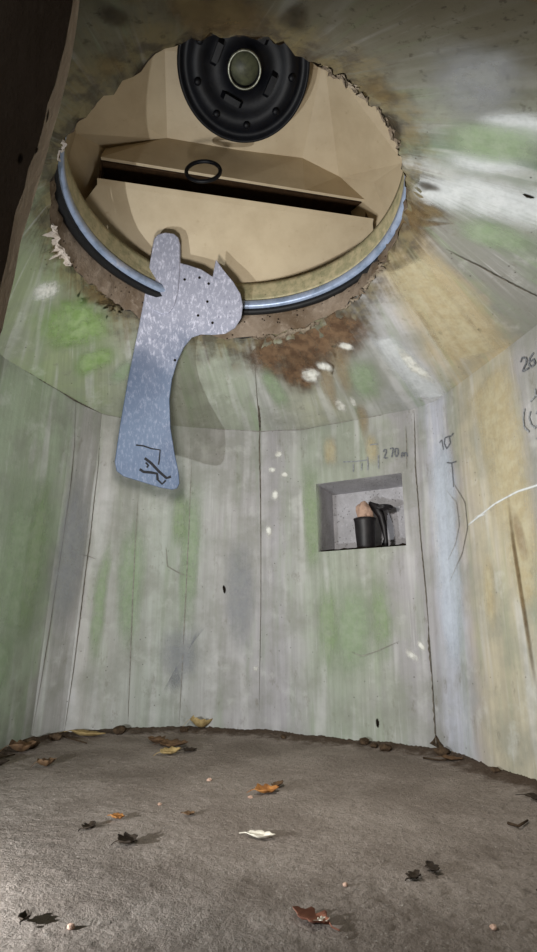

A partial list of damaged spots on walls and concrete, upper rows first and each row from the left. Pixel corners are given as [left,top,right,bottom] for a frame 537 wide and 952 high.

spalling [318,65,401,150]
rust [250,312,363,399]